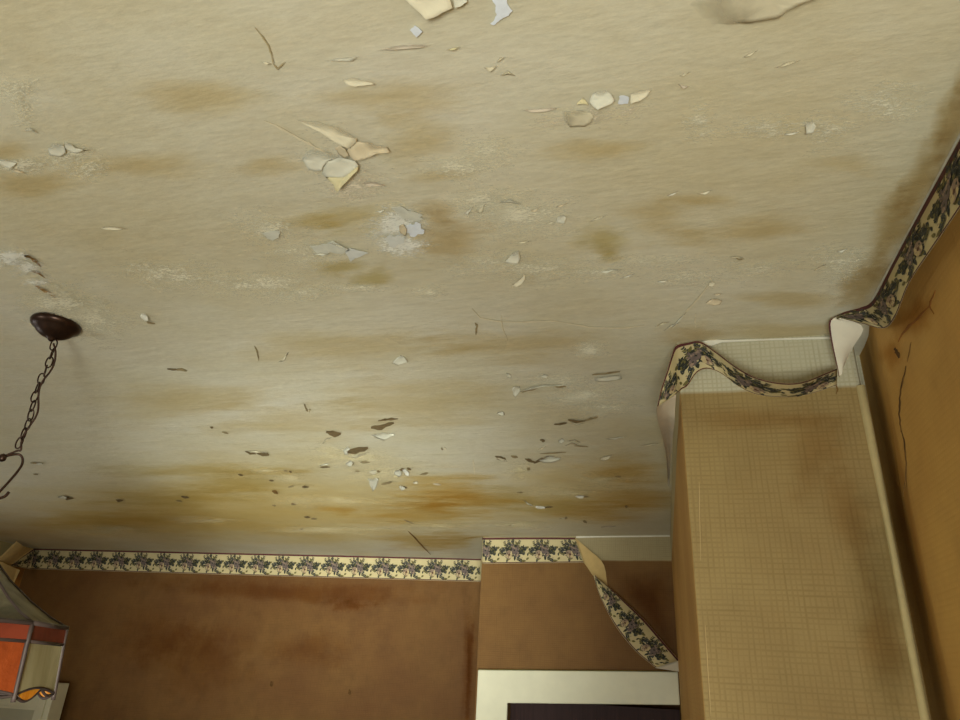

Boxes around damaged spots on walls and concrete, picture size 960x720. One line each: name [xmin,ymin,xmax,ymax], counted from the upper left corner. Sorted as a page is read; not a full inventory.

peeling [388,0,467,50]
flaking render [490,0,513,25]
peeling [722,0,811,23]
peeling [568,90,651,127]
peeling [300,121,389,192]
flaking render [377,206,424,248]
flaking render [310,241,368,262]
peeling [371,418,397,441]
crack [898,343,911,494]
peeling [343,447,428,491]
peeling [495,439,588,471]
peeling [575,538,607,585]